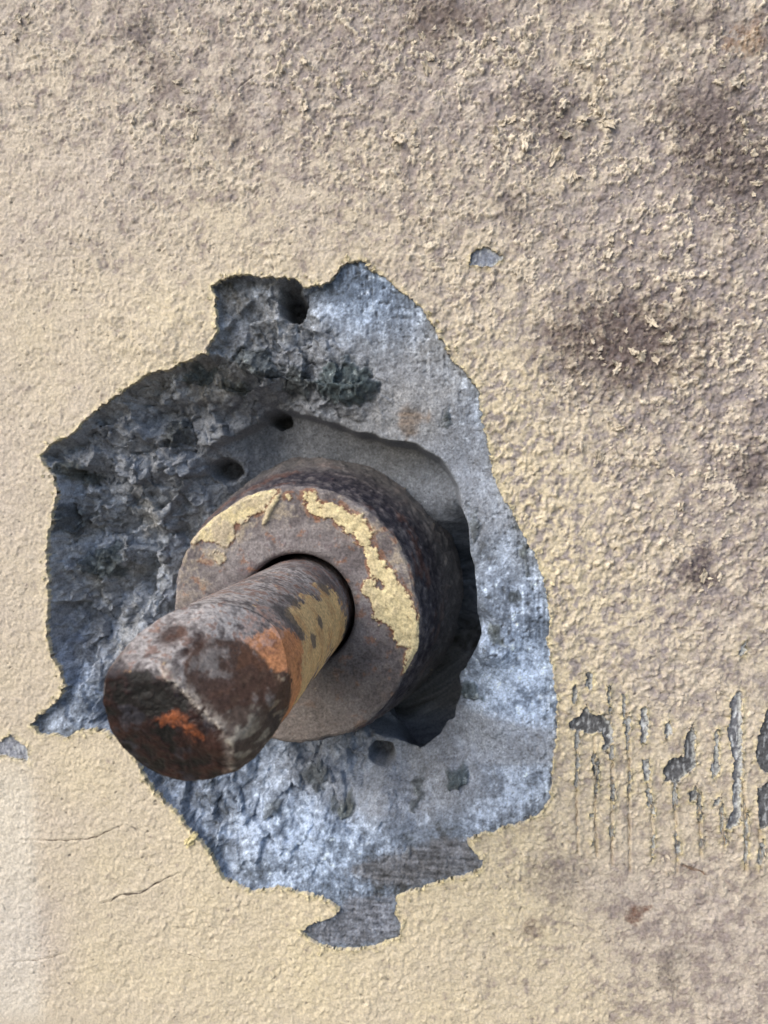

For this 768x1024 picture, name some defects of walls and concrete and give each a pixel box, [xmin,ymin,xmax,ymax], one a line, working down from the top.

peeling [469,247,503,267]
peeling [603,232,615,259]
spalling [32,254,768,957]
peeling [0,734,29,761]